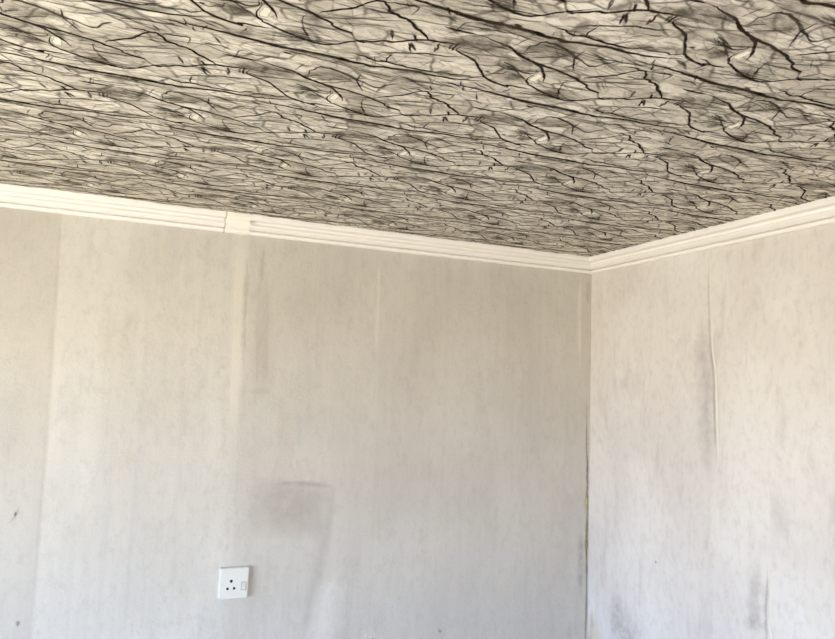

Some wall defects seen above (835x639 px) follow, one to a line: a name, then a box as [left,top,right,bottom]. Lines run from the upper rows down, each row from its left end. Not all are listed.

crack [224,212,253,235]